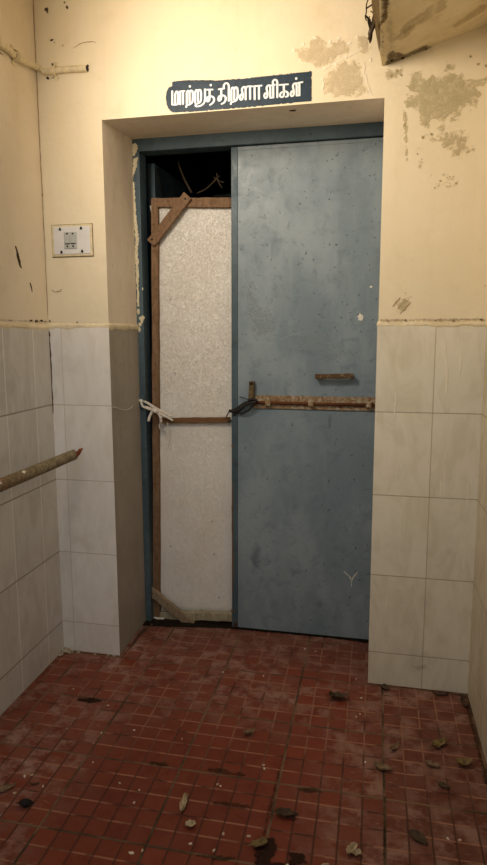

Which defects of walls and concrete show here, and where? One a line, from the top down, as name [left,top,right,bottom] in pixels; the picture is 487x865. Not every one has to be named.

peeling [292,35,372,96]
peeling [386,55,487,168]